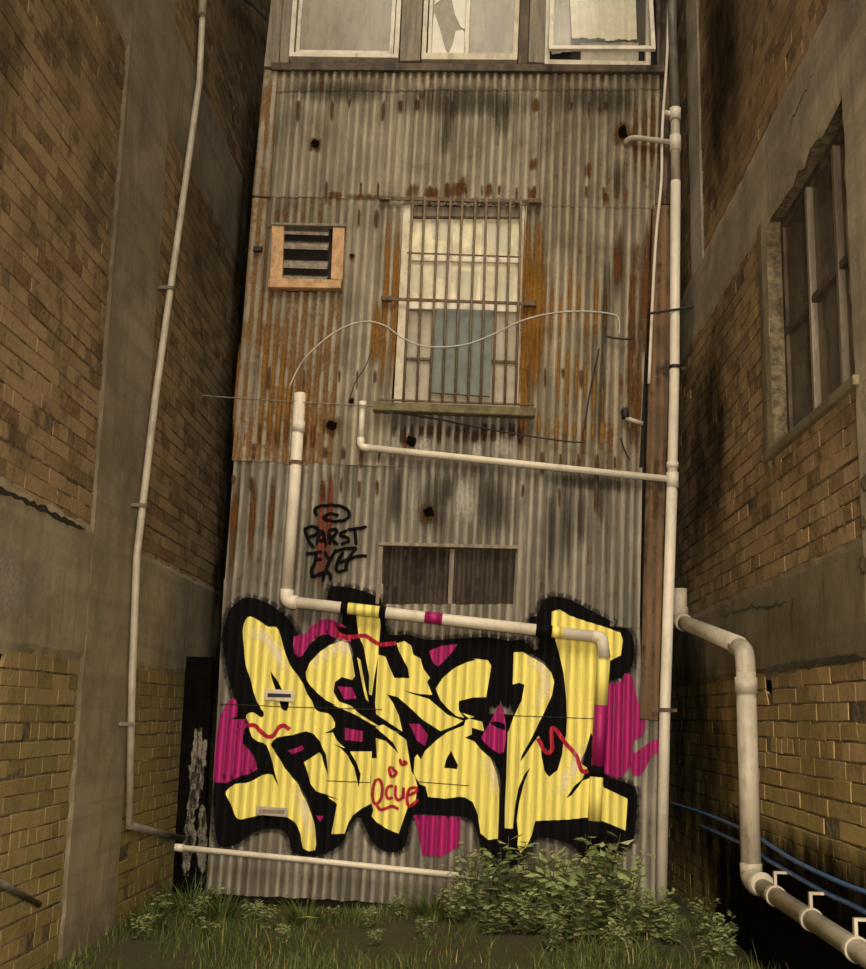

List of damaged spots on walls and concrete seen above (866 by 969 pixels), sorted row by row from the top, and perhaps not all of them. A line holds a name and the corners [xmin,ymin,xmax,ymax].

rust [325,182,379,202]
rust [408,178,466,205]
rust [233,313,340,460]
rust [372,212,400,383]
rust [391,224,606,511]
rust [615,227,650,446]
peeling [182,729,208,875]